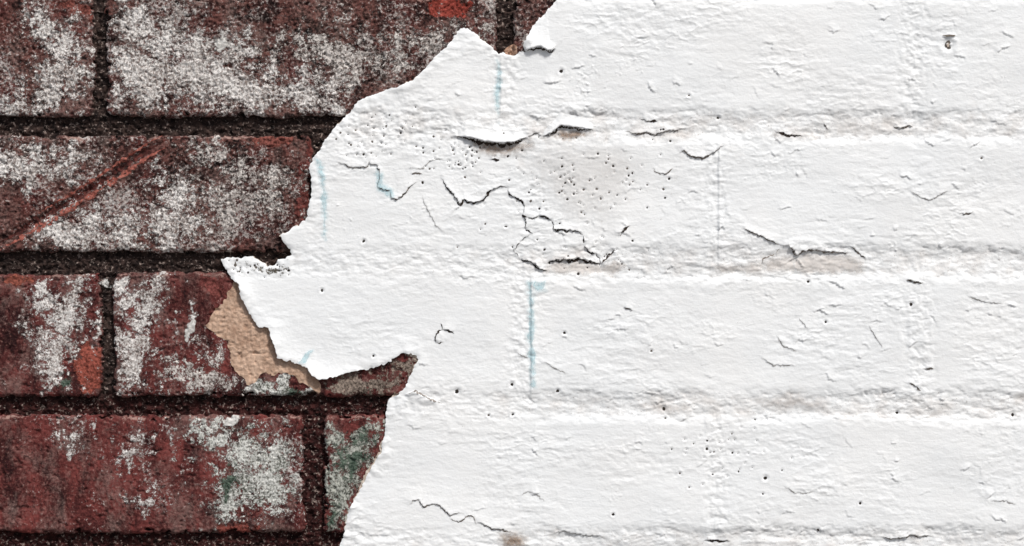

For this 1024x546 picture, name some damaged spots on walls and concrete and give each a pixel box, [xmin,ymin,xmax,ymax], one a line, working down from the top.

damp [0,0,496,118]
peeling [525,34,556,53]
damp [0,135,324,253]
spalling [252,136,313,221]
crack [346,159,629,271]
peeling [447,113,593,178]
crack [747,230,865,262]
spalling [74,341,103,394]
damp [15,271,312,397]
peeling [206,259,321,394]
damp [104,415,306,532]
damp [324,418,386,532]